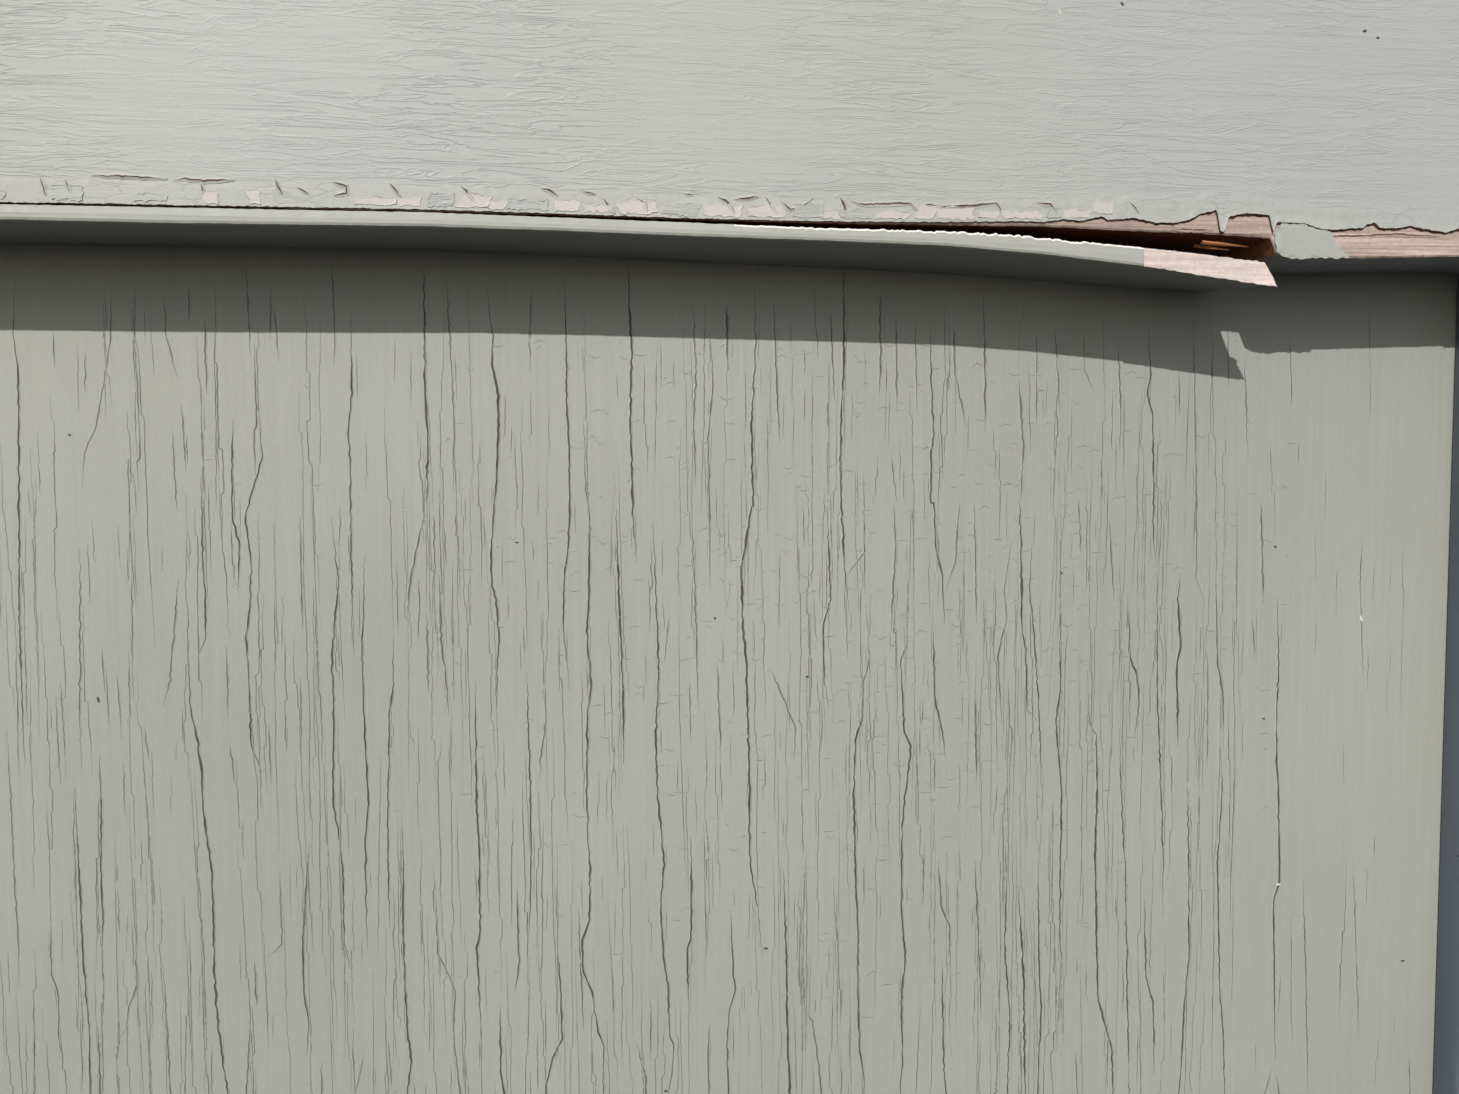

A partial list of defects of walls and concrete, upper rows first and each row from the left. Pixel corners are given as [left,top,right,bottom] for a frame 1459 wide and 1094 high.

peeling [39,172,309,205]
peeling [333,181,1140,221]
peeling [1143,223,1440,287]
crack [0,264,1411,1094]